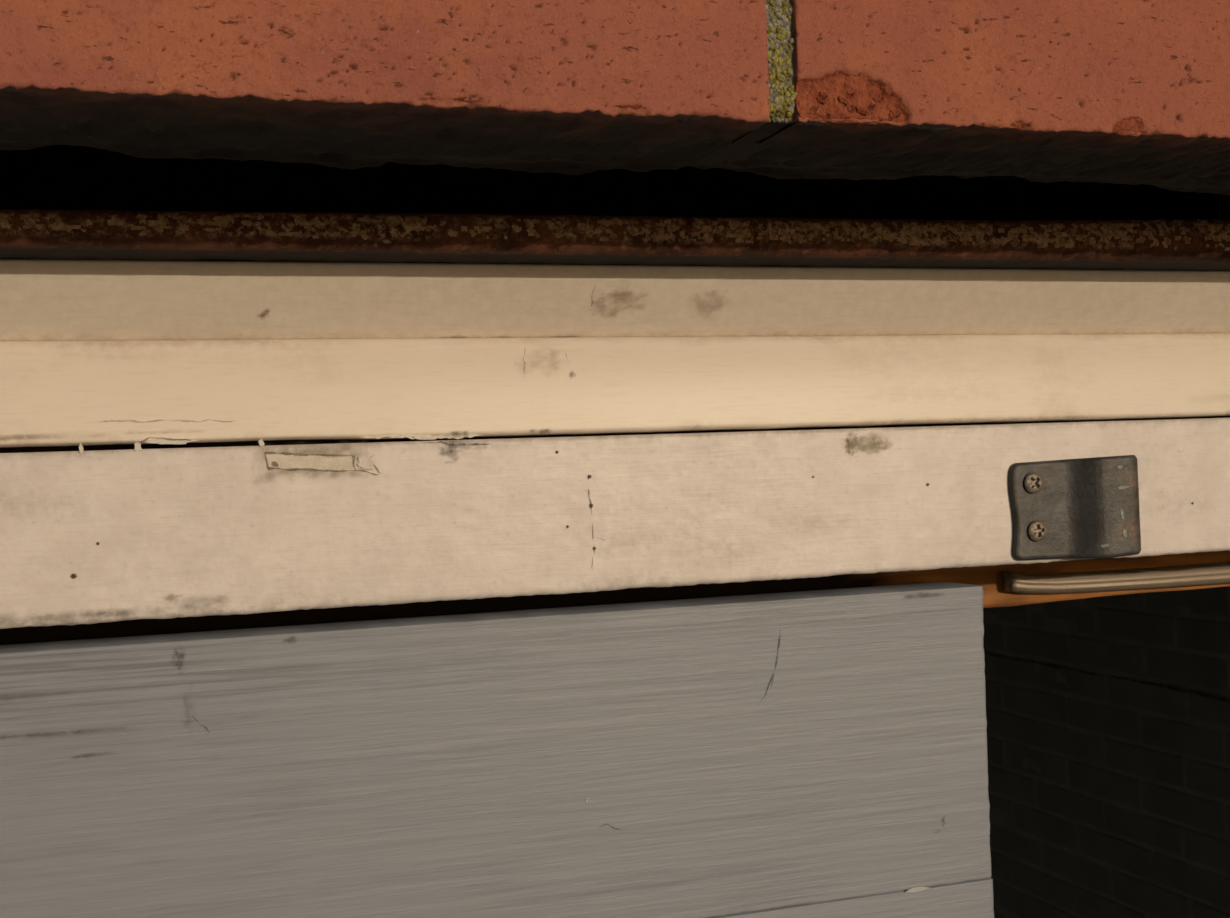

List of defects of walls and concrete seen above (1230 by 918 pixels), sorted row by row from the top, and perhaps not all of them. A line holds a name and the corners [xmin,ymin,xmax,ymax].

spalling [796,71,909,125]
peeling [258,438,380,475]